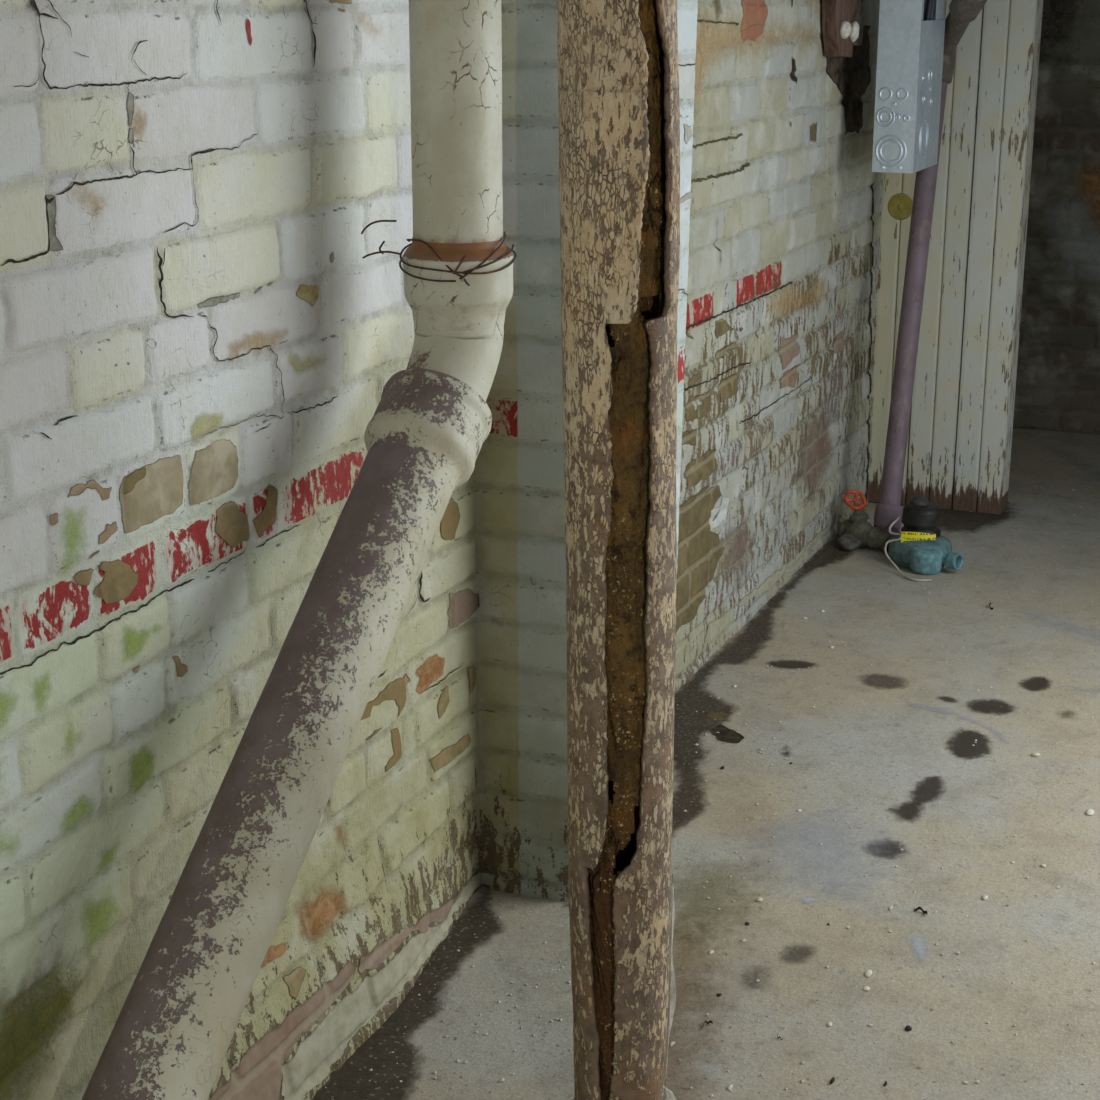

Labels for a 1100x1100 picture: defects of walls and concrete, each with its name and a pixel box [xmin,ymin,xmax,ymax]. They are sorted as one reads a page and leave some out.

crack [15,0,187,90]
spalling [740,0,768,41]
crack [691,163,750,184]
crack [1,250,49,266]
crack [56,133,338,435]
peeling [676,318,748,632]
peeling [68,439,278,604]
peeling [360,674,410,772]
water stain [672,520,851,834]
water stain [948,730,990,759]
water stain [969,700,1013,714]
water stain [890,776,943,821]